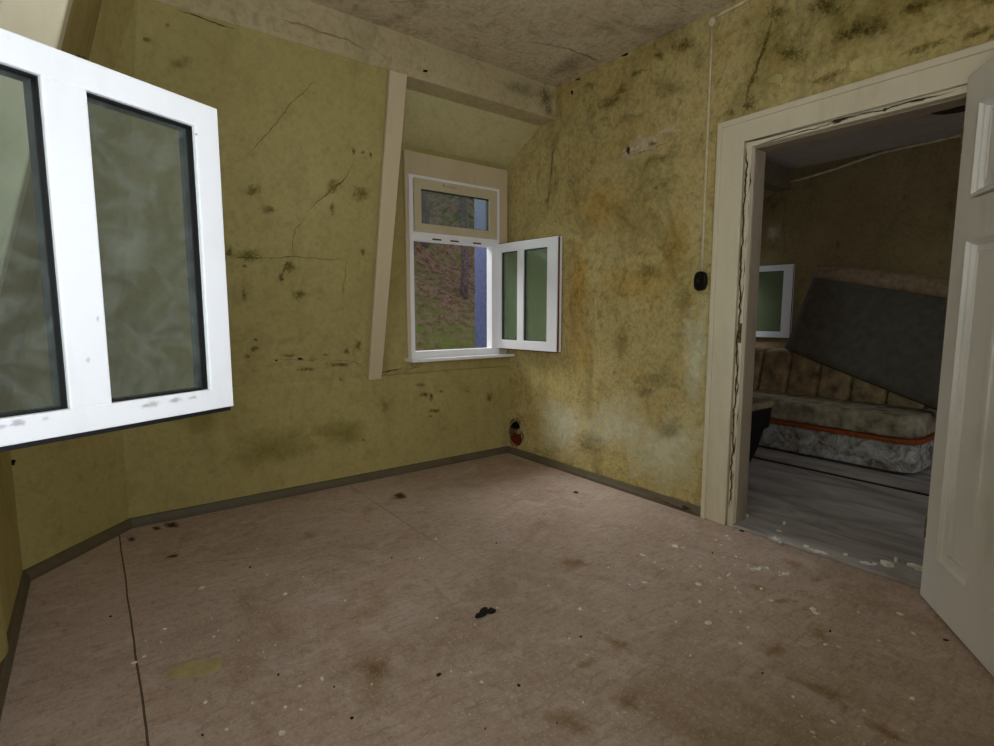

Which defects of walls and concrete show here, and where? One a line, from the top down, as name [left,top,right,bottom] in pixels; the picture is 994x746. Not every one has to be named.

spalling [508,418,523,447]